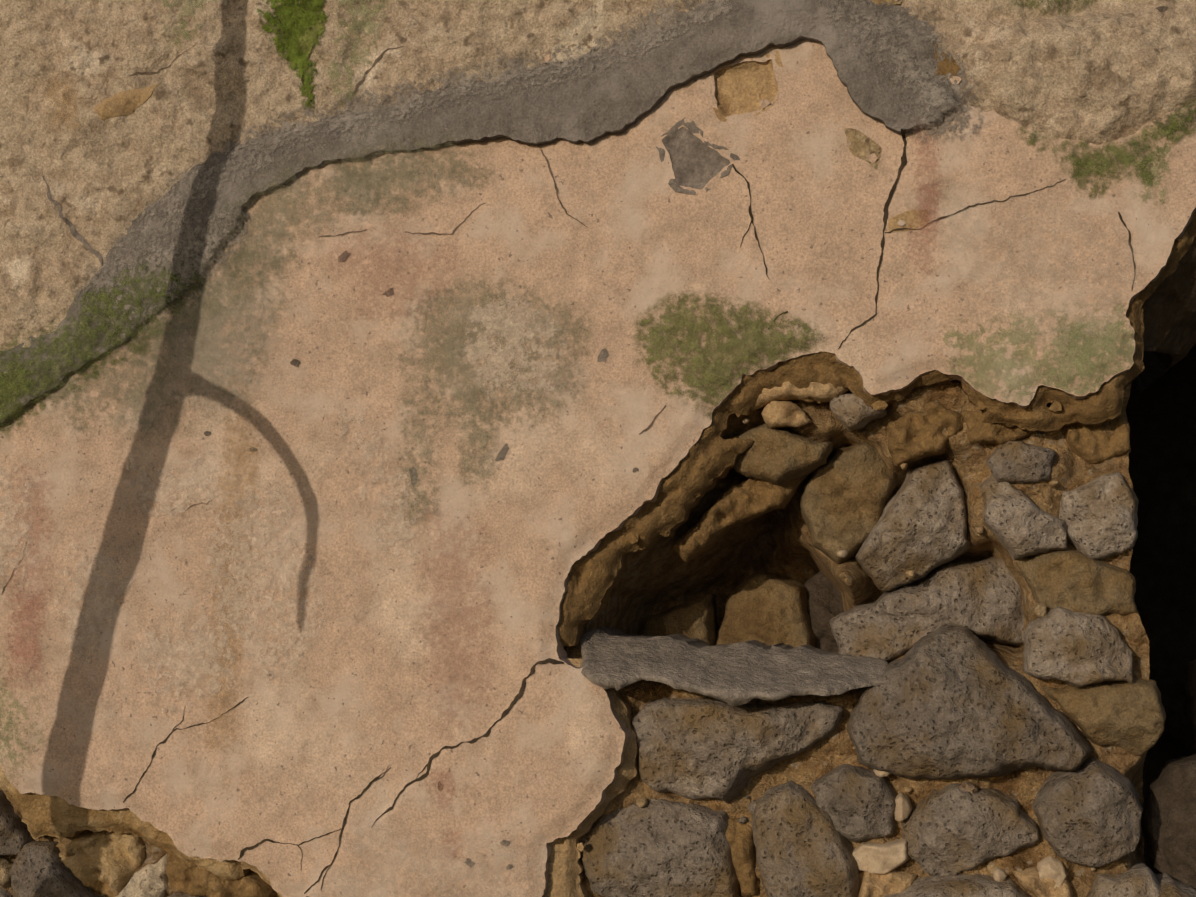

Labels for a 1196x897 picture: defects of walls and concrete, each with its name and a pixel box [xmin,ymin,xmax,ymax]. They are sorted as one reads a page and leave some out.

peeling [544,0,605,65]
spalling [713,50,783,123]
damp [66,143,469,430]
crack [541,149,588,228]
spalling [656,117,740,195]
crack [732,164,769,279]
crack [838,129,1066,349]
spalling [557,210,1196,667]
spalling [0,766,282,897]
crack [123,697,248,803]
crack [238,658,566,894]
spalling [544,688,639,897]